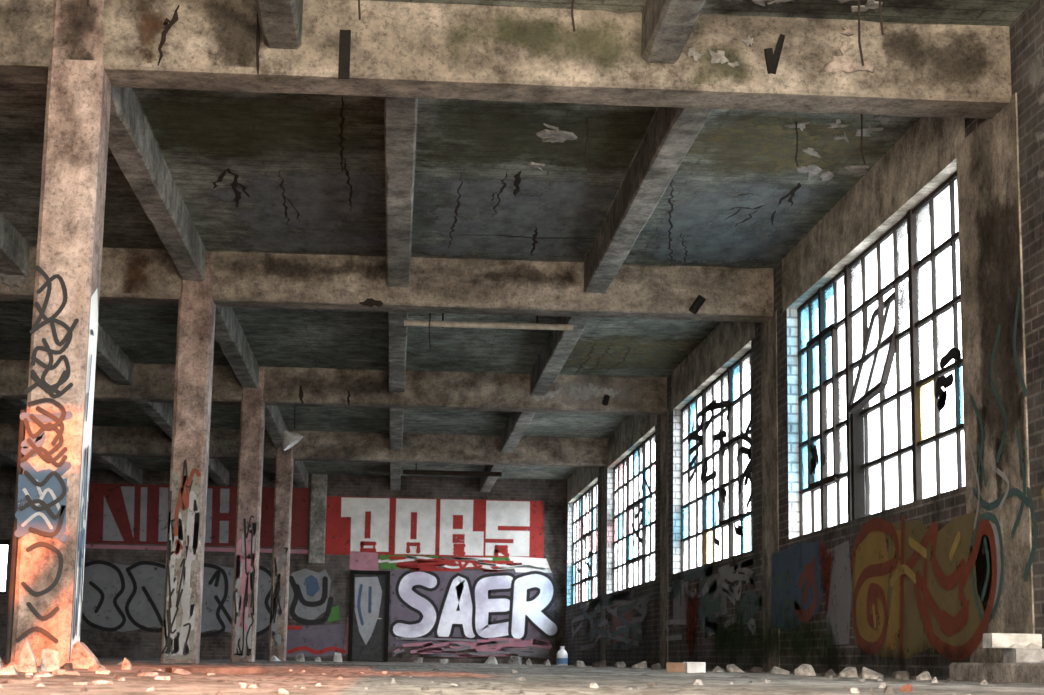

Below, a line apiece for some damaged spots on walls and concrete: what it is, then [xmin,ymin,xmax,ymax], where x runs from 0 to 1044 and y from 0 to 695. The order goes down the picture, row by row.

crack [157,5,180,66]
peeling [838,0,883,13]
crack [338,96,353,212]
spalling [536,123,577,143]
crack [213,168,250,207]
crack [448,173,463,250]
crack [492,171,587,255]